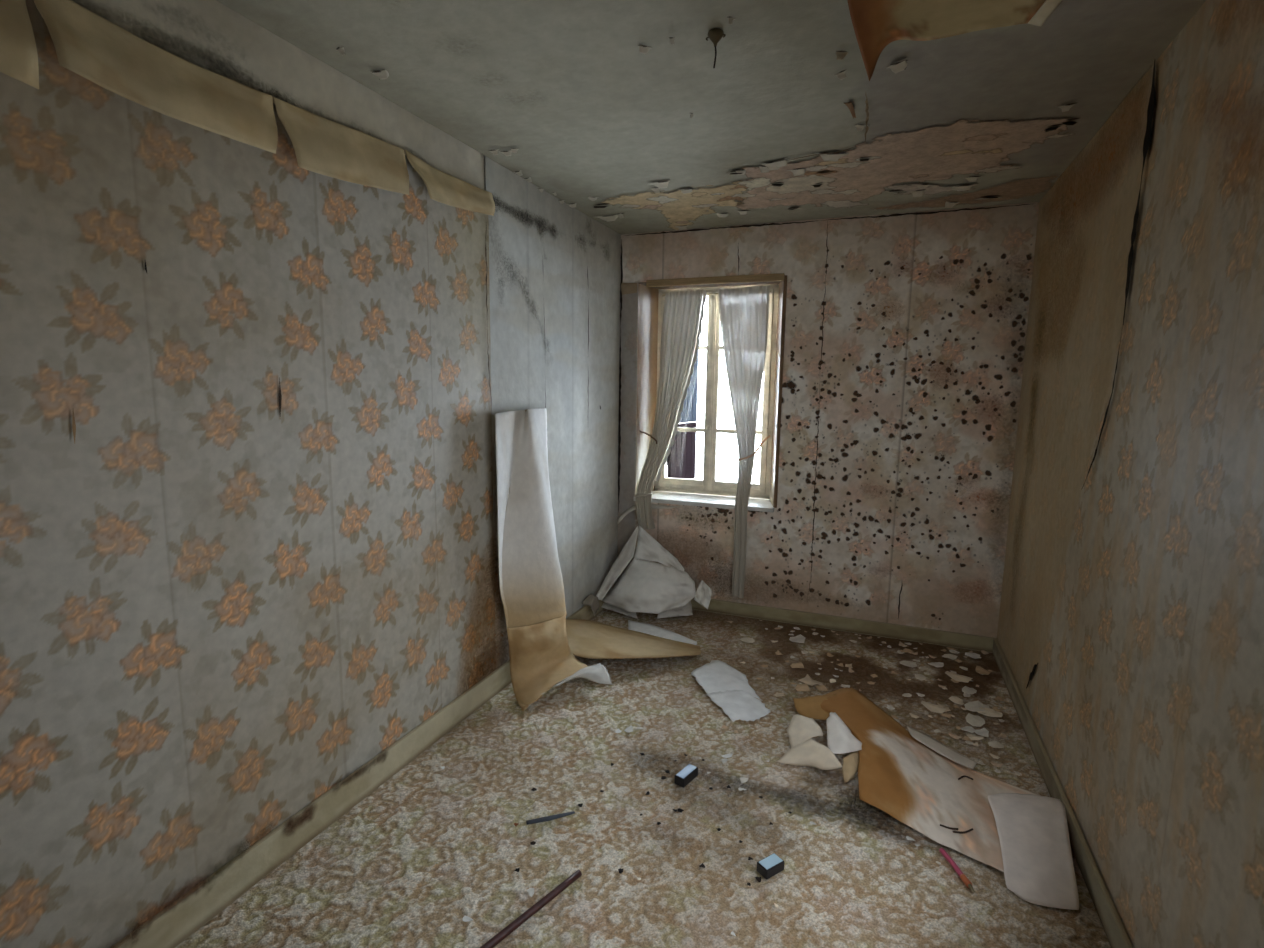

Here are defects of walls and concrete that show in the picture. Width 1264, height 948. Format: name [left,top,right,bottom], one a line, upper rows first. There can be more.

peeling [514,94,1080,230]
damp [493,199,556,236]
damp [748,262,1029,606]
damp [683,505,732,583]
damp [336,753,386,788]
damp [285,806,313,832]
damp [111,830,267,948]